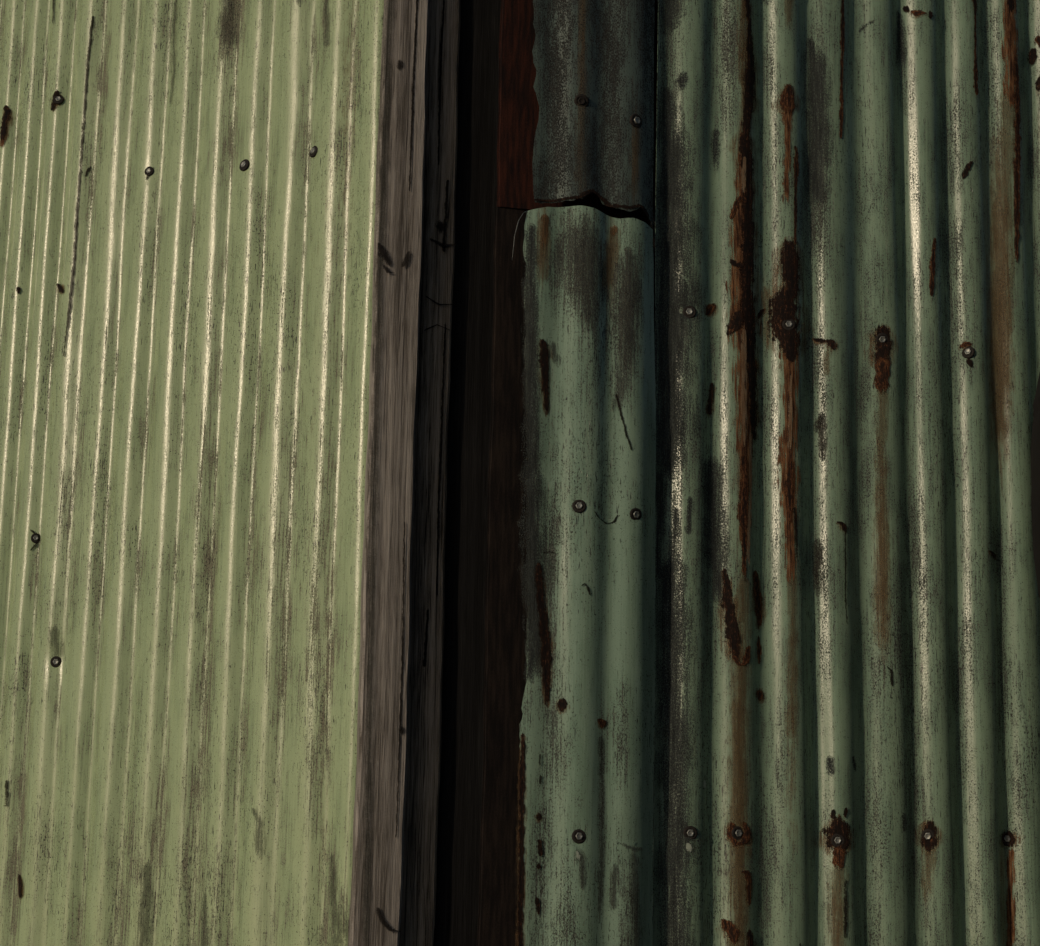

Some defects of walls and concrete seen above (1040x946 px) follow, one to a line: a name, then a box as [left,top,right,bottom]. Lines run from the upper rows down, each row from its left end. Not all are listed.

corrosion [1001,0,1040,263]
corrosion [538,339,561,415]
corrosion [719,0,810,666]
corrosion [865,325,896,394]
corrosion [534,551,557,705]
corrosion [721,919,756,946]
corrosion [815,807,854,941]
corrosion [1001,831,1020,946]